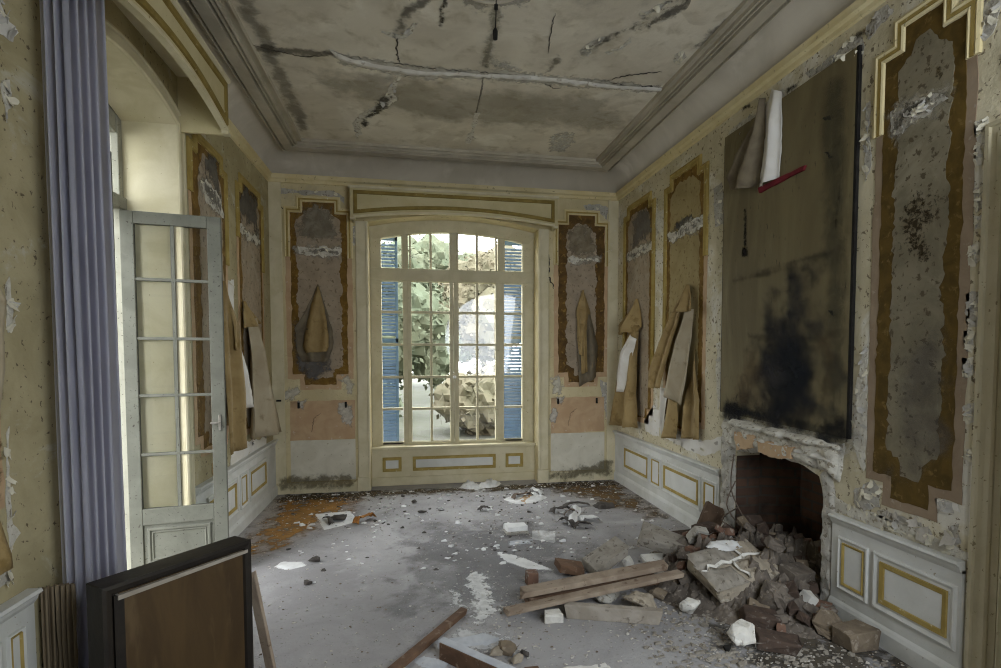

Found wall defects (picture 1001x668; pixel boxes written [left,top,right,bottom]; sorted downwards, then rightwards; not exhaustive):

peeling [0,0,19,42]
peeling [980,0,1001,41]
peeling [352,74,401,139]
crack [329,38,662,113]
flaking render [890,87,948,138]
peeling [973,116,989,166]
flaking render [292,226,355,258]
flaking render [568,255,601,265]
mould [900,191,938,262]
peeling [961,291,979,379]
peeling [834,343,968,561]
peeling [4,426,21,552]